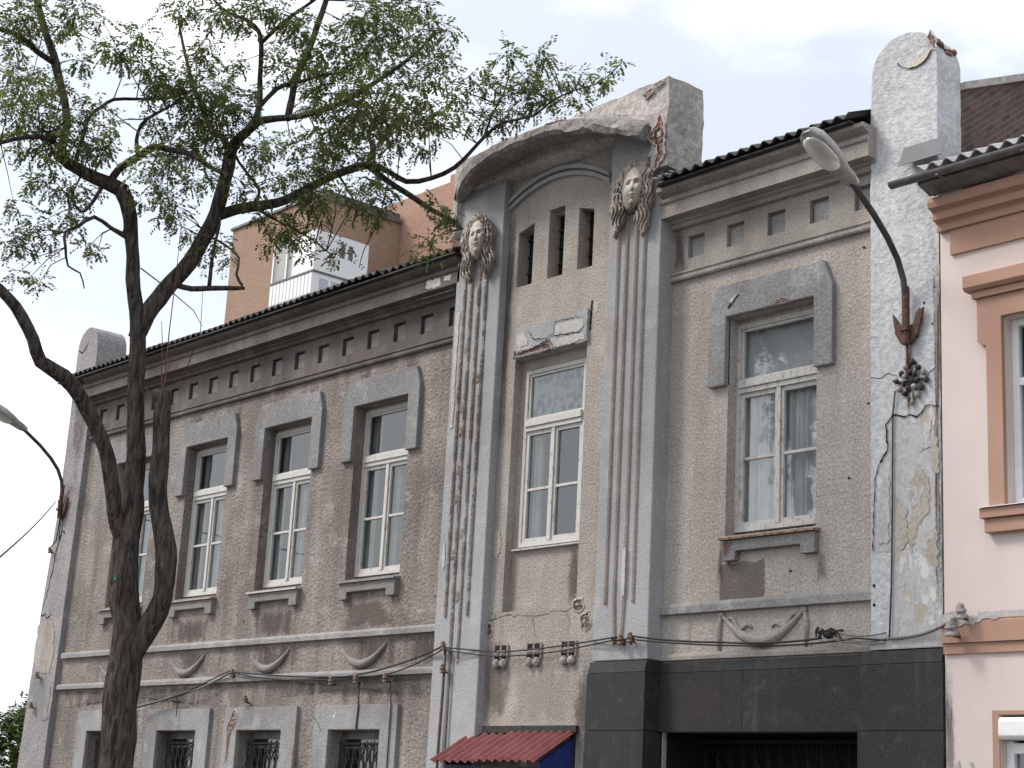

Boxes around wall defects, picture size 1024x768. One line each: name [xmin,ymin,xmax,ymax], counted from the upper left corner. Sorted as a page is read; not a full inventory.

flaking render [897,29,957,69]
flaking render [642,79,664,100]
flaking render [647,113,666,172]
peeling [513,300,598,359]
peeling [872,404,1024,648]
flaking render [572,597,592,632]